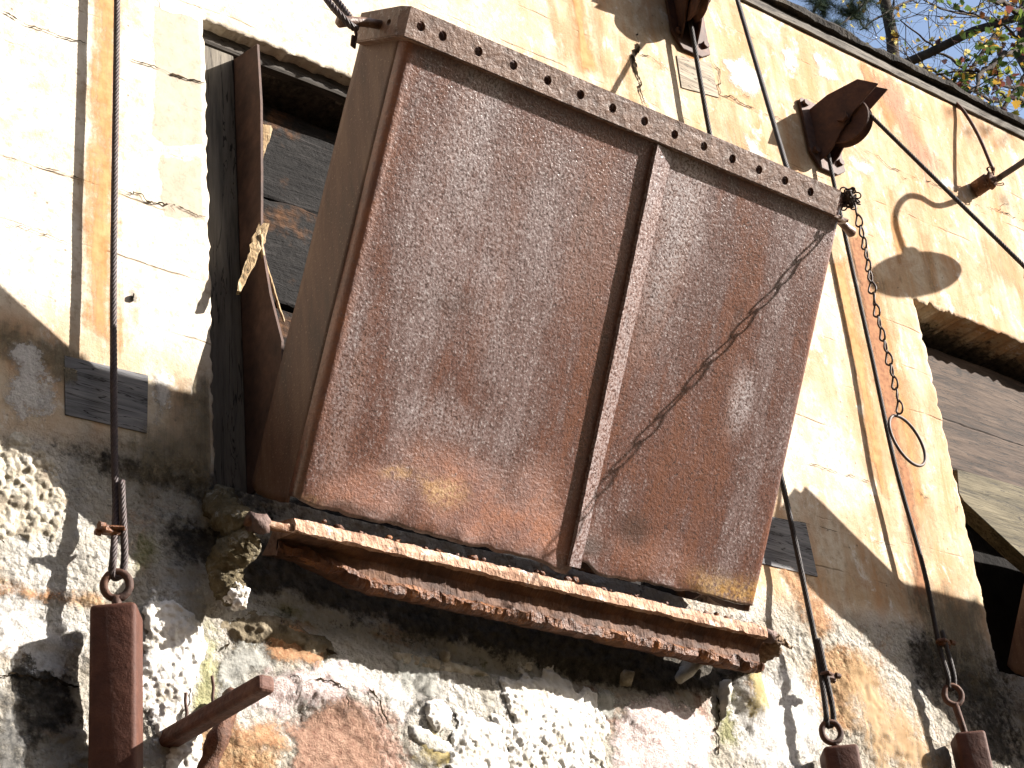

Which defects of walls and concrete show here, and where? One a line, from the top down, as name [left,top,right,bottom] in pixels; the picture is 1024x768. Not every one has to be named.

crack [126,57,205,83]
corrosion [83,0,123,344]
crack [121,189,208,218]
corrosion [833,237,928,603]
peeling [391,649,490,677]
peeling [619,670,635,687]
peeling [675,661,703,684]
peeling [409,725,476,753]